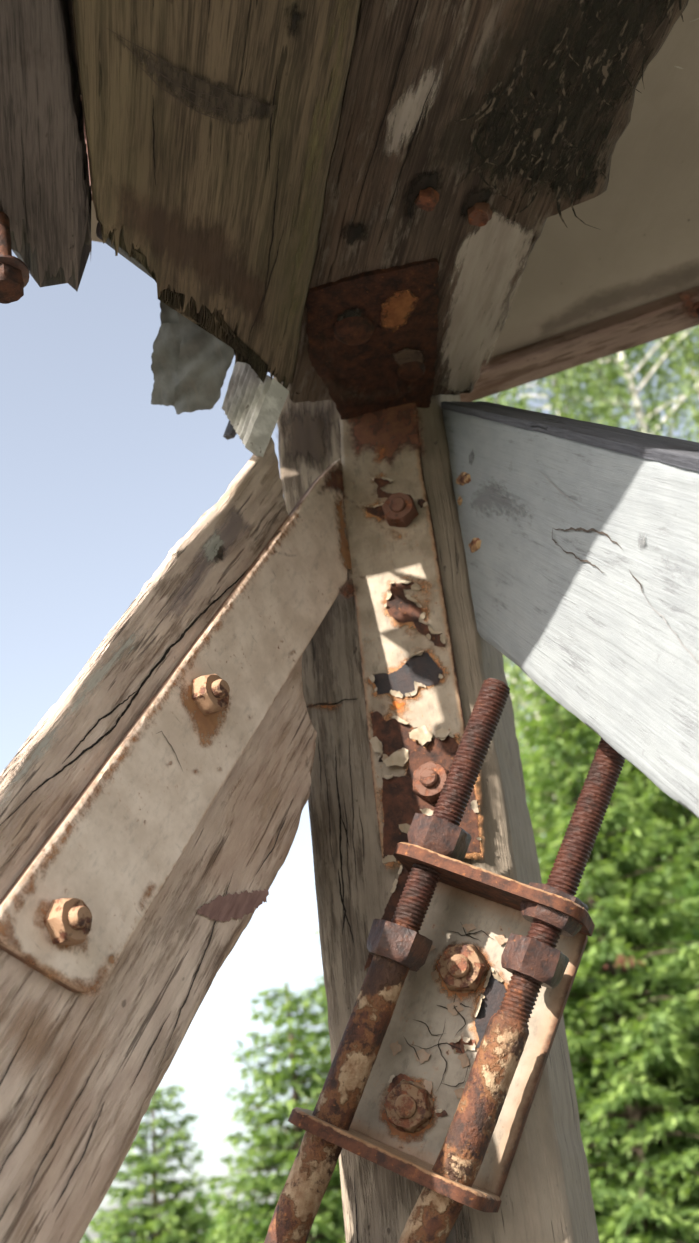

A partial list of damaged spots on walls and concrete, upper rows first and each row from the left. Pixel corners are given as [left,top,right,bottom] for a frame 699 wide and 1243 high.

corrosion [382,290,418,329]
corrosion [346,402,425,465]
crack [543,474,699,666]
corrosion [15,735,138,907]
crack [0,569,248,826]
crack [306,698,364,944]
peeling [367,580,460,922]
peeling [459,777,483,857]
corrosion [0,921,115,995]
crack [0,815,287,1220]
crack [390,923,508,1099]
corrosion [434,942,491,1001]